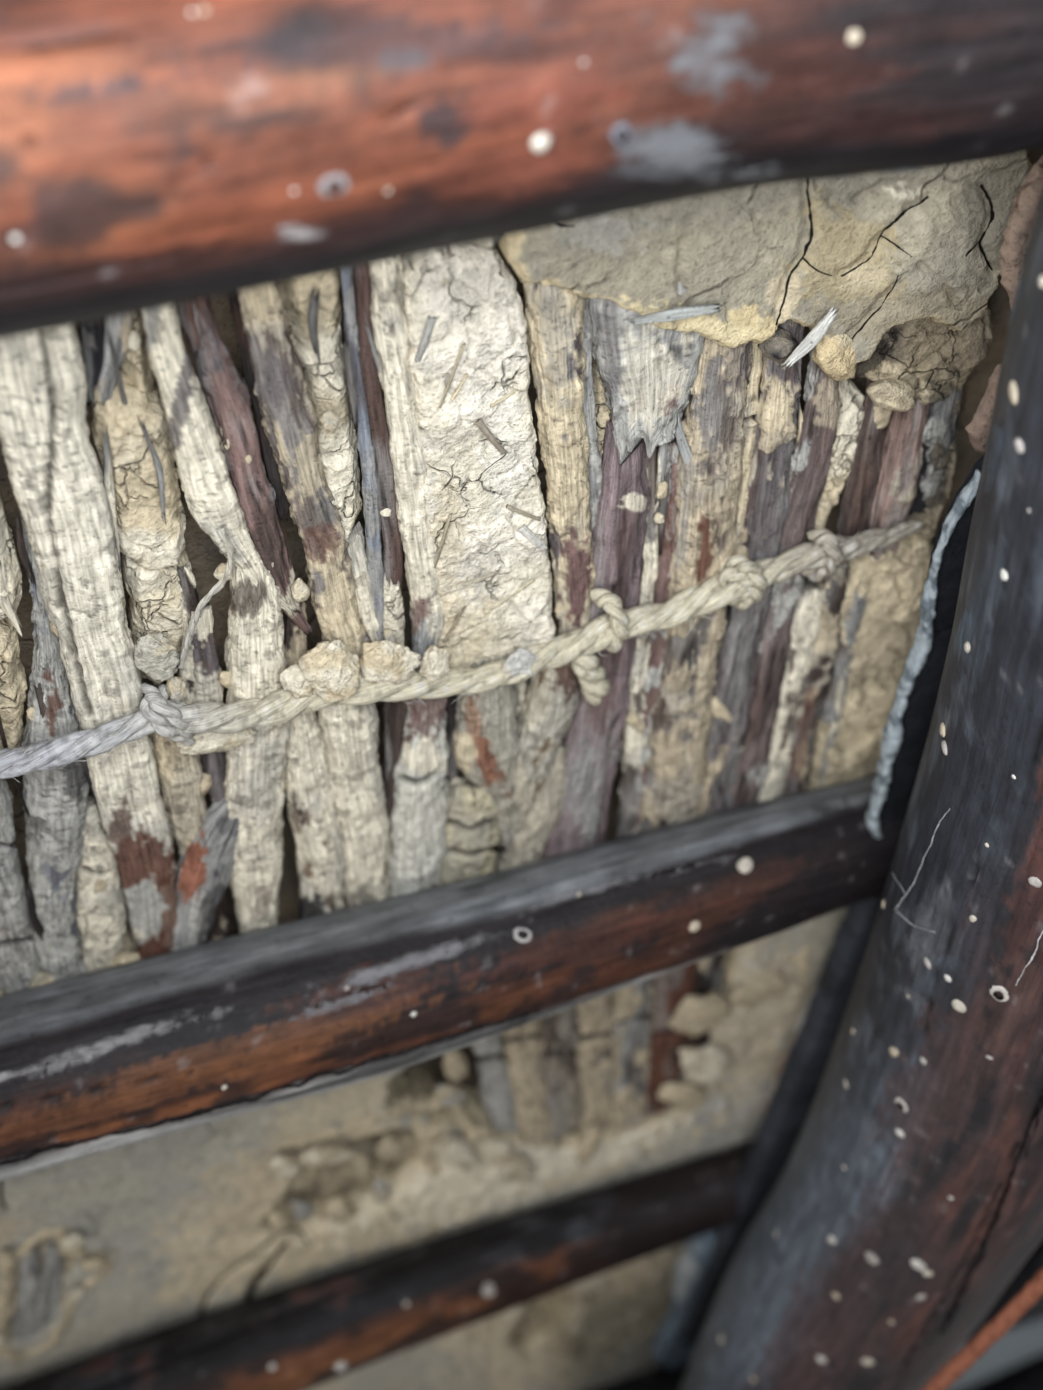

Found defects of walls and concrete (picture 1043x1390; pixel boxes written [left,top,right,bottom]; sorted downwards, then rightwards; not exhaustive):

crack [775,180,929,340]
crack [965,184,994,270]
flaking render [244,946,816,1249]
flaking render [0,1226,114,1363]
crack [199,1227,310,1314]
crack [943,1094,1043,1332]